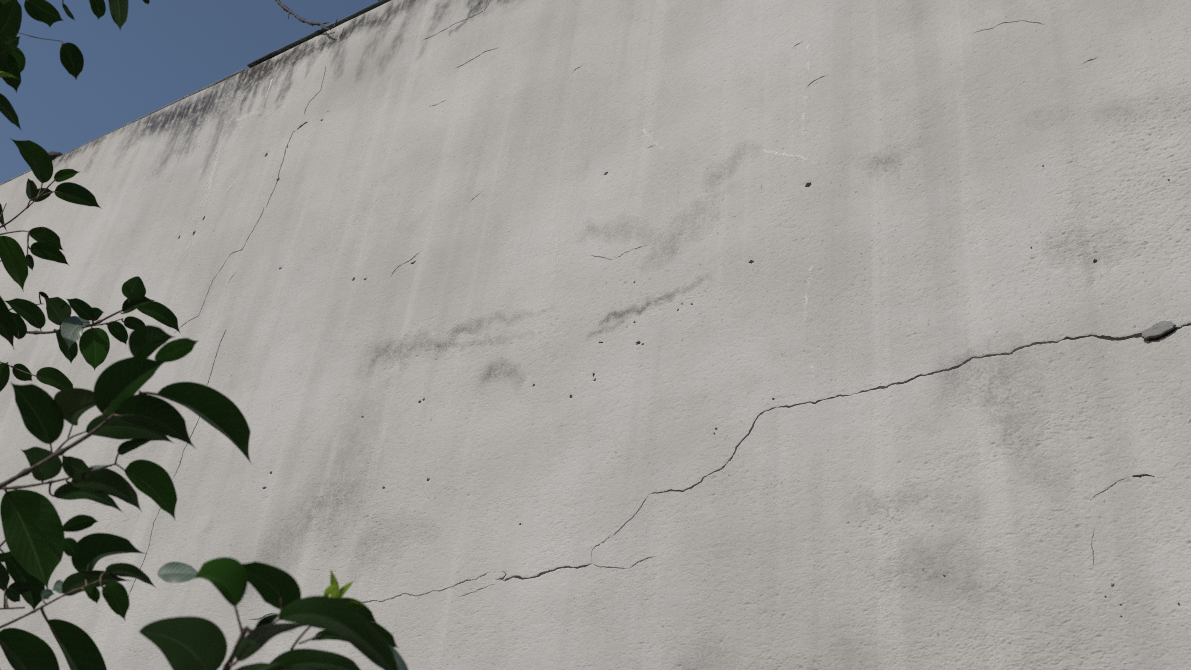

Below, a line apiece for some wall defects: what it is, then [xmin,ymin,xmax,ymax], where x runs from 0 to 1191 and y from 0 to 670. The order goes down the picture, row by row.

leakage [147,6,398,133]
crack [362,323,1191,603]